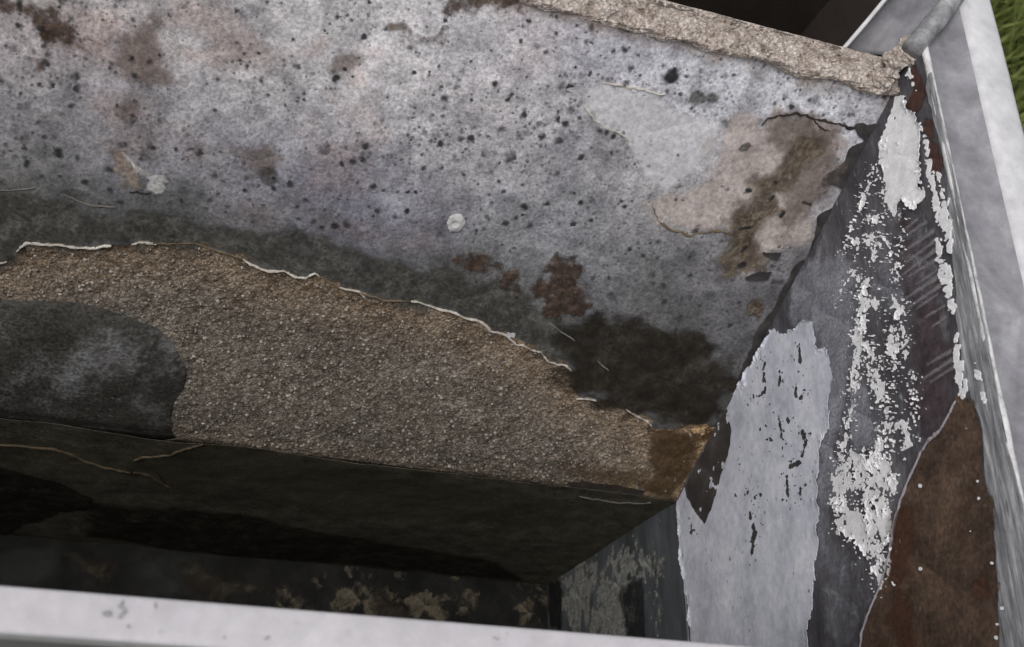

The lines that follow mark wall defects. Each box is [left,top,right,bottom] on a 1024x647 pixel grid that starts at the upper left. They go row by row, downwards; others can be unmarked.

crack [762,112,856,131]
rust [907,64,943,179]
leakage [0,193,740,425]
spalling [0,240,832,647]
rust [453,252,593,321]
spalling [518,0,968,647]
rust [859,214,1000,647]